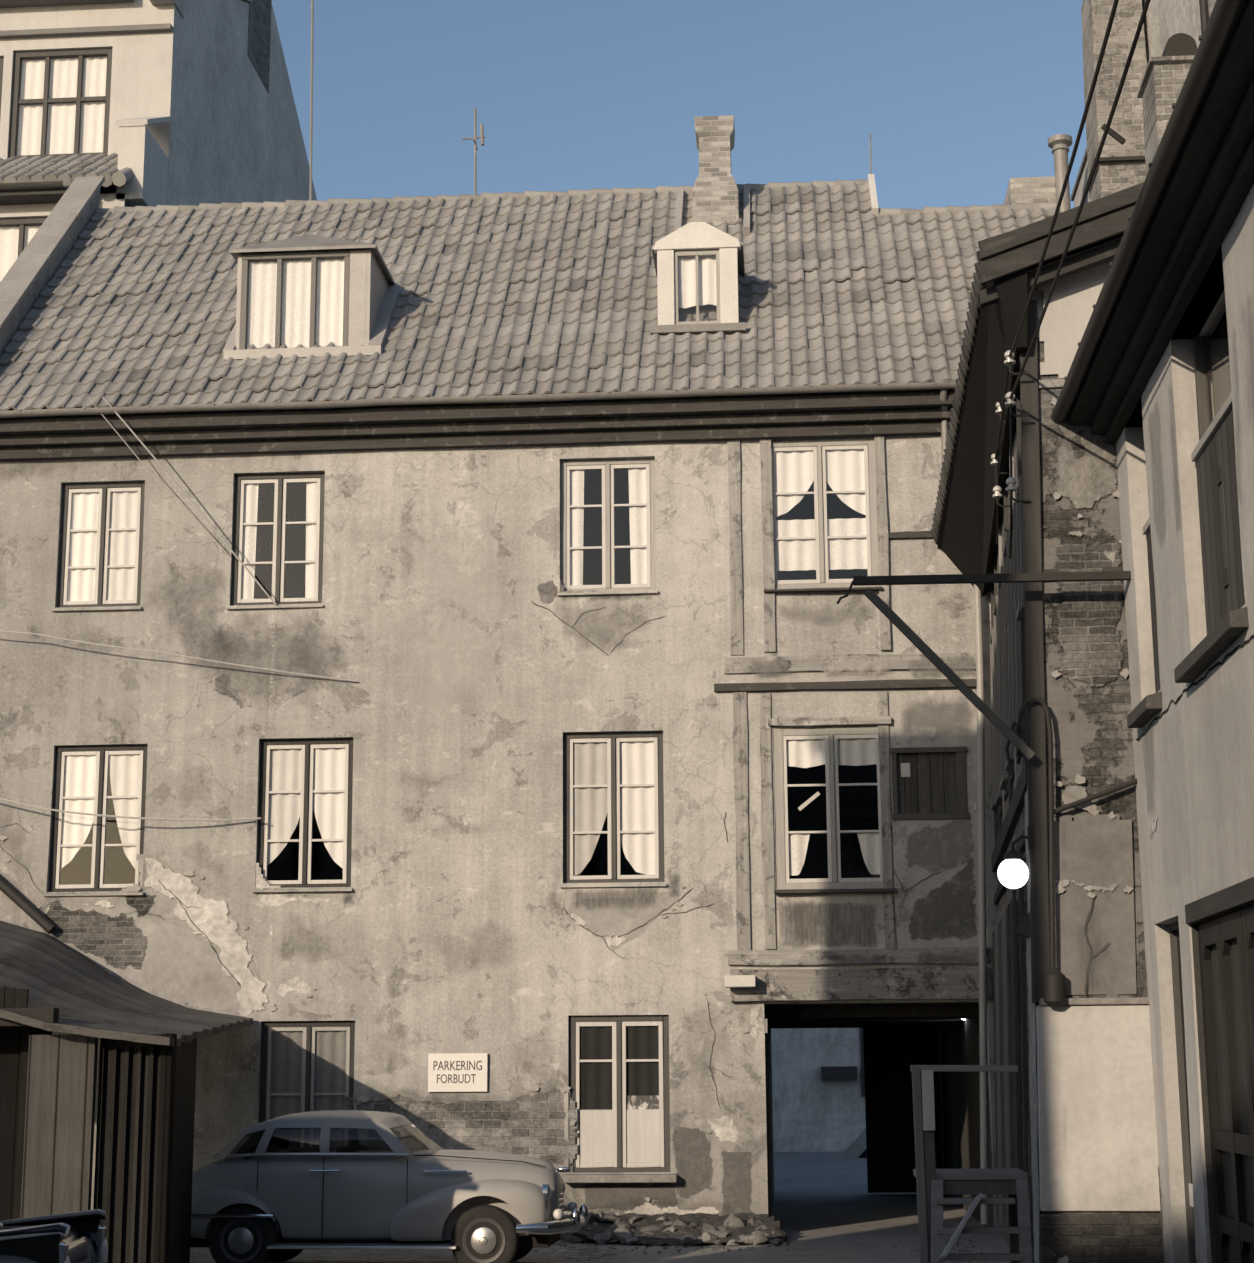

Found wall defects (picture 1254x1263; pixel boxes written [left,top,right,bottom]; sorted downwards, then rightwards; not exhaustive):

flaking render [1051,413,1129,687]
crack [532,602,664,656]
flaking render [1054,774,1116,819]
flaking render [37,854,316,1016]
crack [564,888,715,960]
damp [905,819,977,962]
crack [1084,898,1111,996]
damp [583,1127,752,1216]